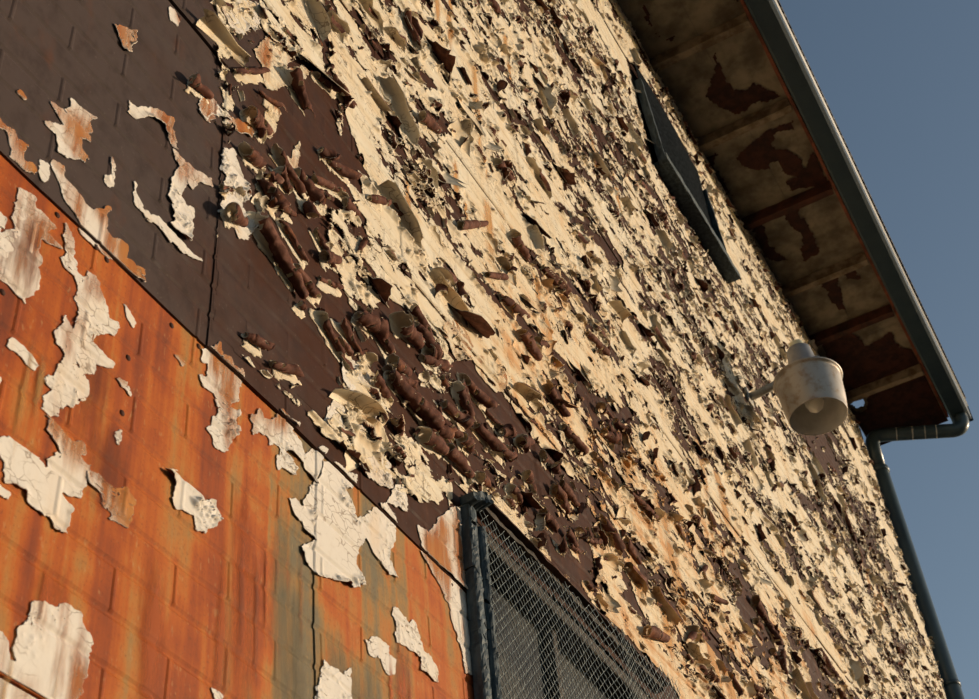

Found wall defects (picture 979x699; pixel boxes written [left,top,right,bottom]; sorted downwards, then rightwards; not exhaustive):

peeling [114,23,138,52]
peeling [168,6,180,26]
peeling [127,100,213,261]
peeling [0,98,146,533]
peeling [184,0,948,699]
peeling [165,468,224,534]
peeling [0,600,94,699]
corrosion [39,581,65,621]